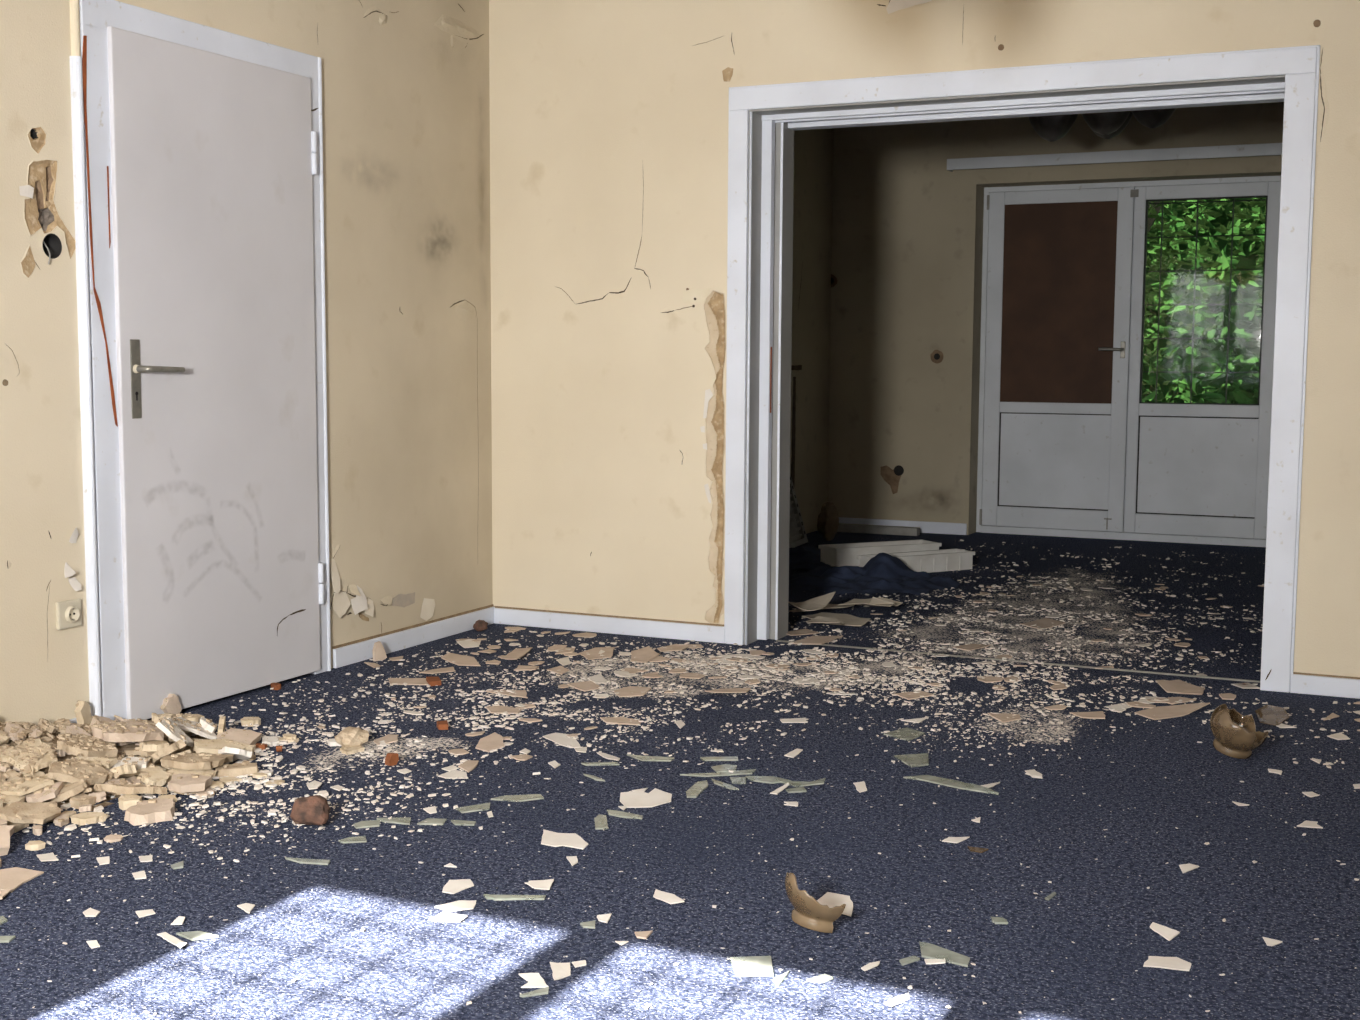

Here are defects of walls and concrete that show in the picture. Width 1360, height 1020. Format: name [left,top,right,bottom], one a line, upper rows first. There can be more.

flaking render [19,126,76,278]
crack [557,179,692,313]
flaking render [700,290,726,624]
peeling [330,559,435,621]